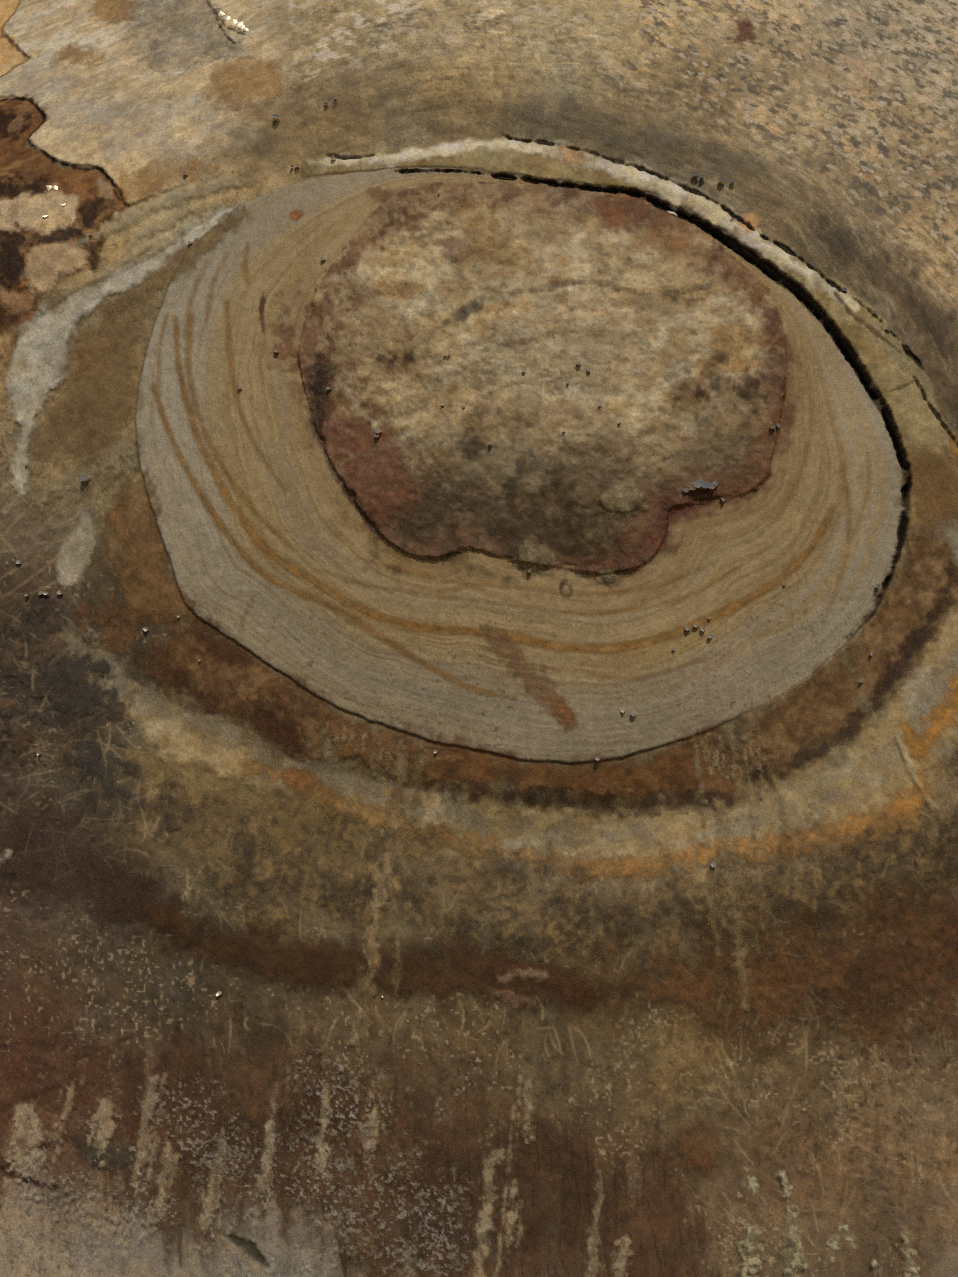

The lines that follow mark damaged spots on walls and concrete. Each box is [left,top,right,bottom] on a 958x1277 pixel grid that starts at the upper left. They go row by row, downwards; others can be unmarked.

crack [208,2,244,44]
crack [327,153,374,161]
spalling [0,95,238,597]
crack [399,136,958,640]
rust [153,315,834,729]
water stain [0,595,958,1059]
rust [132,525,958,881]
water stain [0,1020,721,1277]
water stain [742,1167,759,1194]
water stain [738,1227,768,1277]
water stain [776,1172,808,1277]
water stain [901,1232,920,1277]